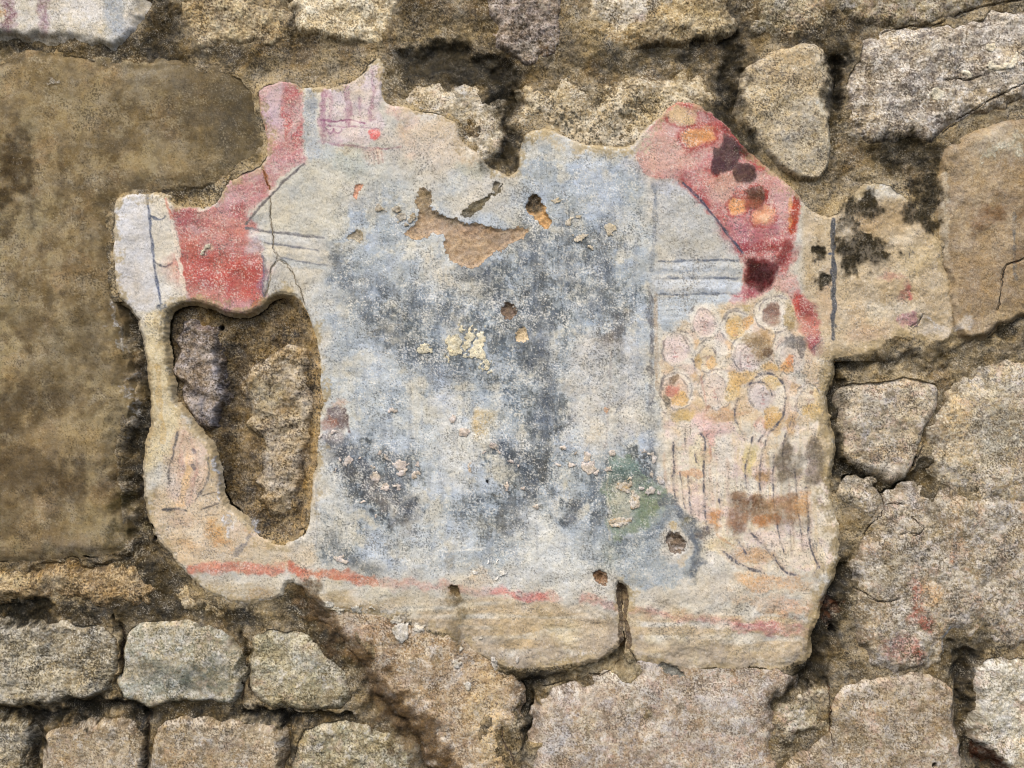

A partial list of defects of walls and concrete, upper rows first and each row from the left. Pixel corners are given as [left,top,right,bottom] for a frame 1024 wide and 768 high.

water stain [415,40,525,169]
spalling [375,181,562,269]
peeling [565,215,594,250]
water stain [835,188,902,277]
spalling [171,296,339,545]
peeling [333,450,420,491]
water stain [293,580,461,768]